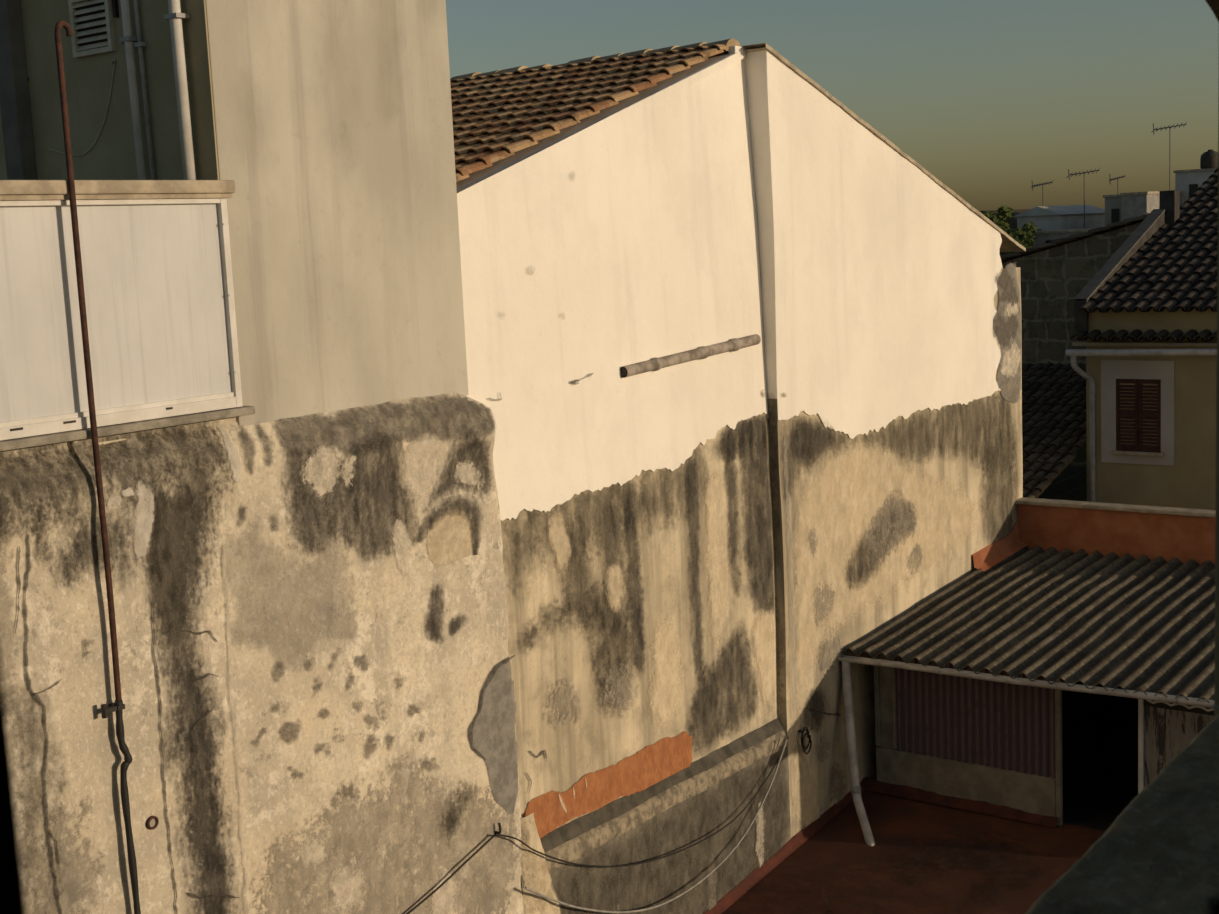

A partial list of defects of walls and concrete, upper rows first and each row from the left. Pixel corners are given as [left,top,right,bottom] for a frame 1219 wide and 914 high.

crack [15,534,62,914]
crack [152,596,239,914]
leakage [0,396,519,914]
peeling [468,655,693,839]
leakage [512,391,1017,751]
leakage [805,690,845,805]